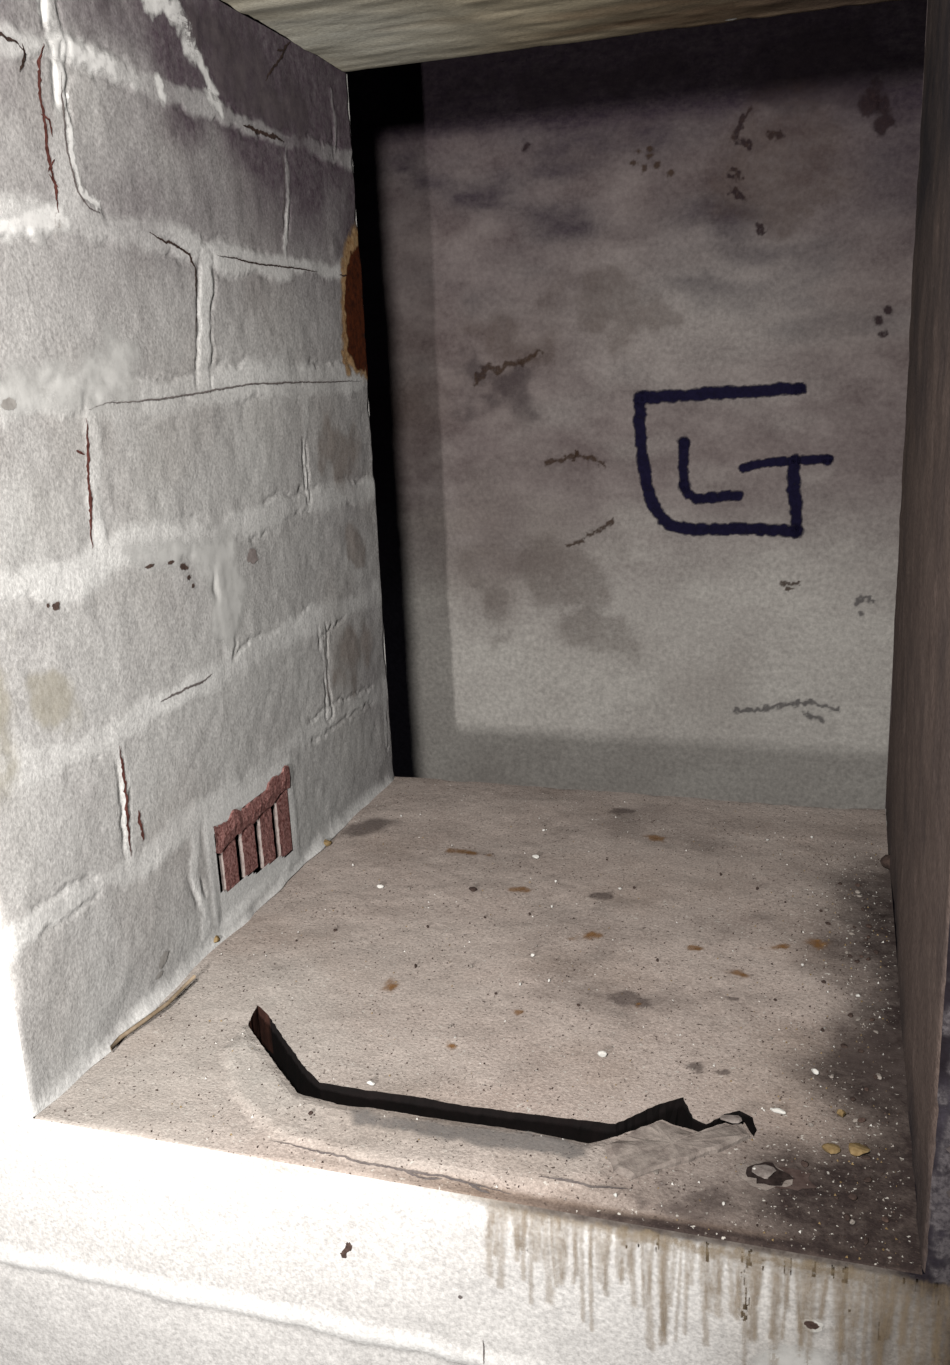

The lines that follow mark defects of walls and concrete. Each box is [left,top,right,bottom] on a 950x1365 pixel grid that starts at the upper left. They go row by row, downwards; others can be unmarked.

damp [37,0,66,112]
crack [265,41,291,81]
crack [0,32,98,213]
damp [154,73,166,103]
damp [731,108,752,150]
damp [859,79,894,135]
rust [341,227,368,380]
damp [876,306,892,337]
damp [474,350,543,386]
damp [545,450,605,466]